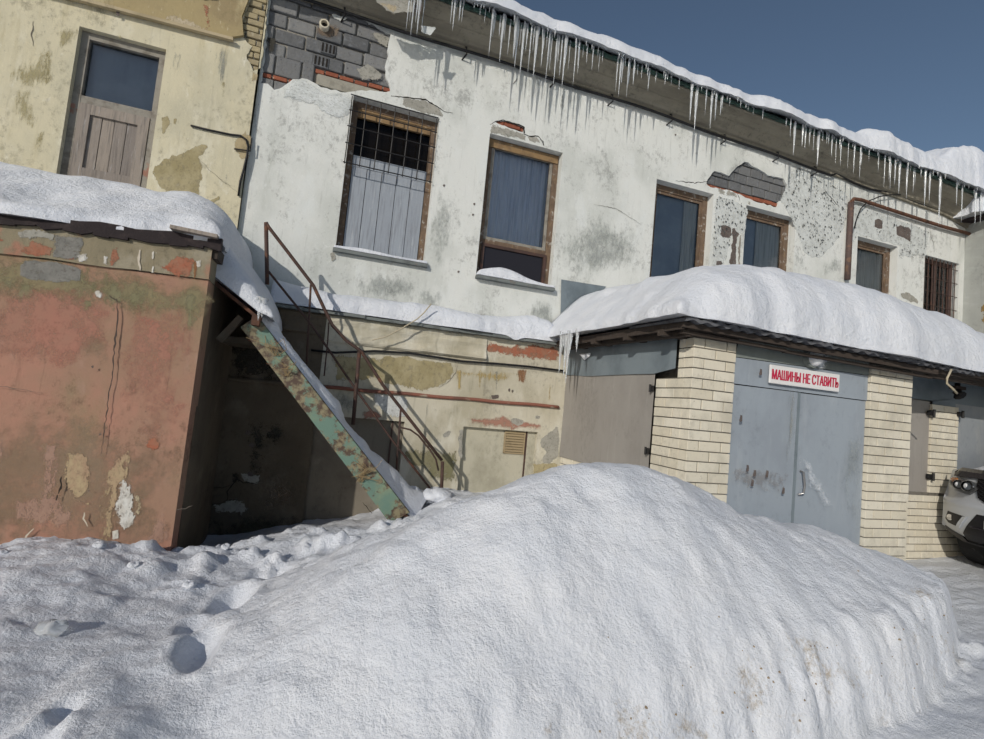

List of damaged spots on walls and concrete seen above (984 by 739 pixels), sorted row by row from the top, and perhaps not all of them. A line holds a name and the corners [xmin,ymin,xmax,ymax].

spalling [243,0,451,117]
spalling [490,120,543,143]
peeling [153,144,208,195]
spalling [678,163,929,266]
peeling [18,229,87,262]
flaking render [162,256,201,278]
crack [101,295,119,453]
flaking render [487,342,559,361]
flaking render [472,415,559,474]
peeling [16,445,141,541]
flaking render [213,499,247,515]